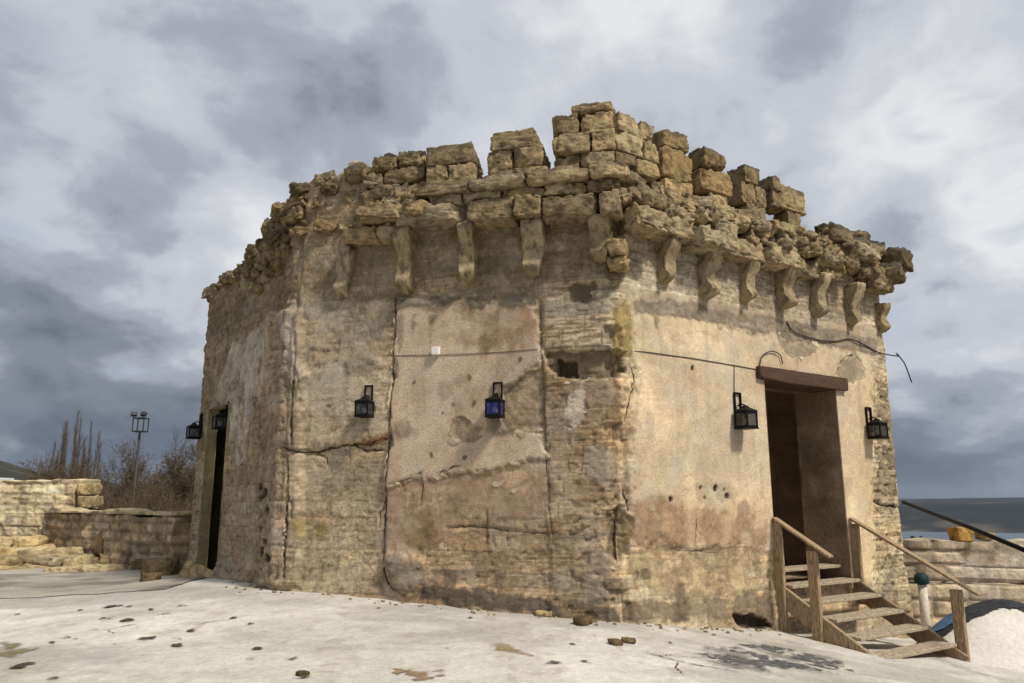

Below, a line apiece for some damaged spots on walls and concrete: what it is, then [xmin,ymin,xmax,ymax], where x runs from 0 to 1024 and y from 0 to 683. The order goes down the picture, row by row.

spalling [564,282,598,309]
flaking render [504,350,625,438]
crack [625,366,639,418]
crack [283,299,460,595]
crack [454,305,554,545]
leakage [420,571,692,622]
leakage [704,582,774,619]
spalling [700,613,782,636]